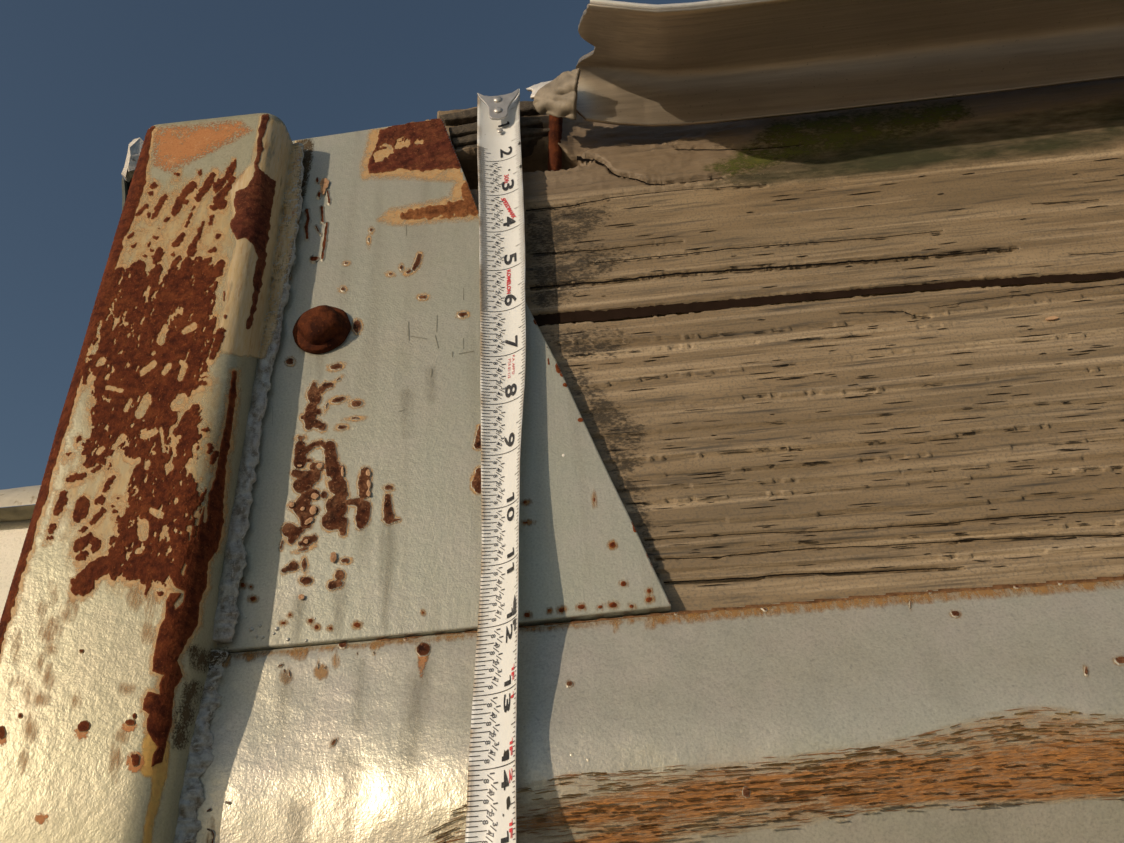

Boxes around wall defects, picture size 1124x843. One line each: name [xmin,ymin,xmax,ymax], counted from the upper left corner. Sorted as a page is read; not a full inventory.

corrosion [361,118,479,244]
crack [839,284,1122,318]
corrosion [0,114,303,843]
corrosion [280,362,401,591]
corrosion [282,643,339,680]
corrosion [519,574,1124,631]